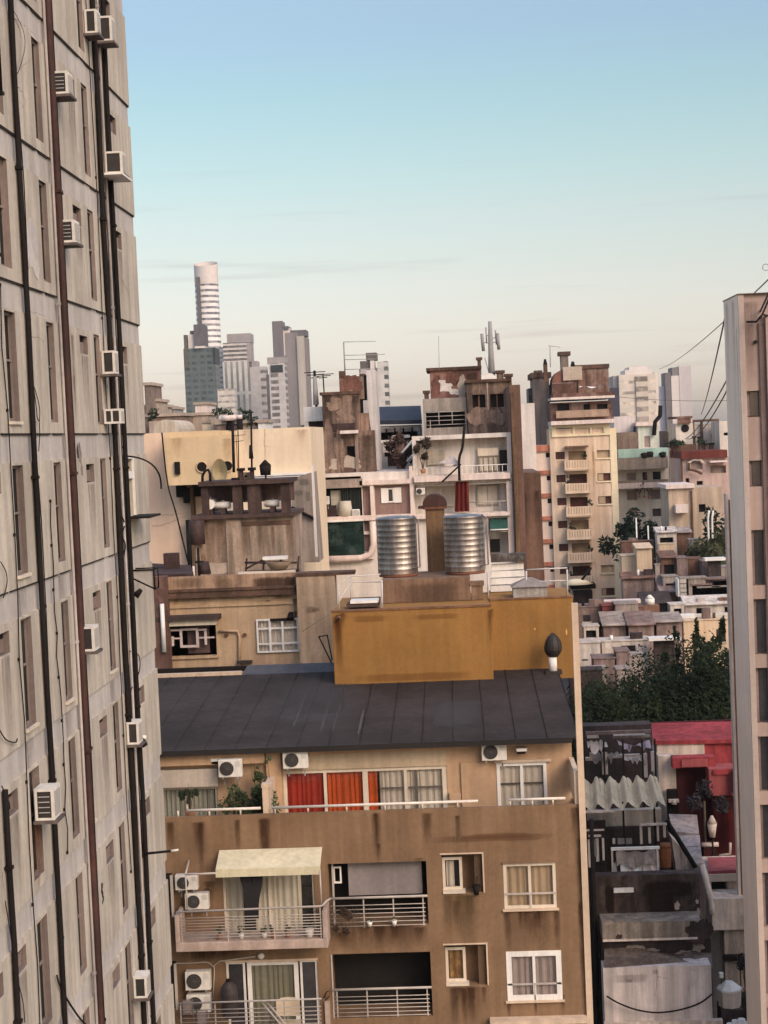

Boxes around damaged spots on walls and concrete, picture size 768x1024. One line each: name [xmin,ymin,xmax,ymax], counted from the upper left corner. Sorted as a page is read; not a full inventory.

peeling [431,371,466,399]
spalling [466,407,506,426]